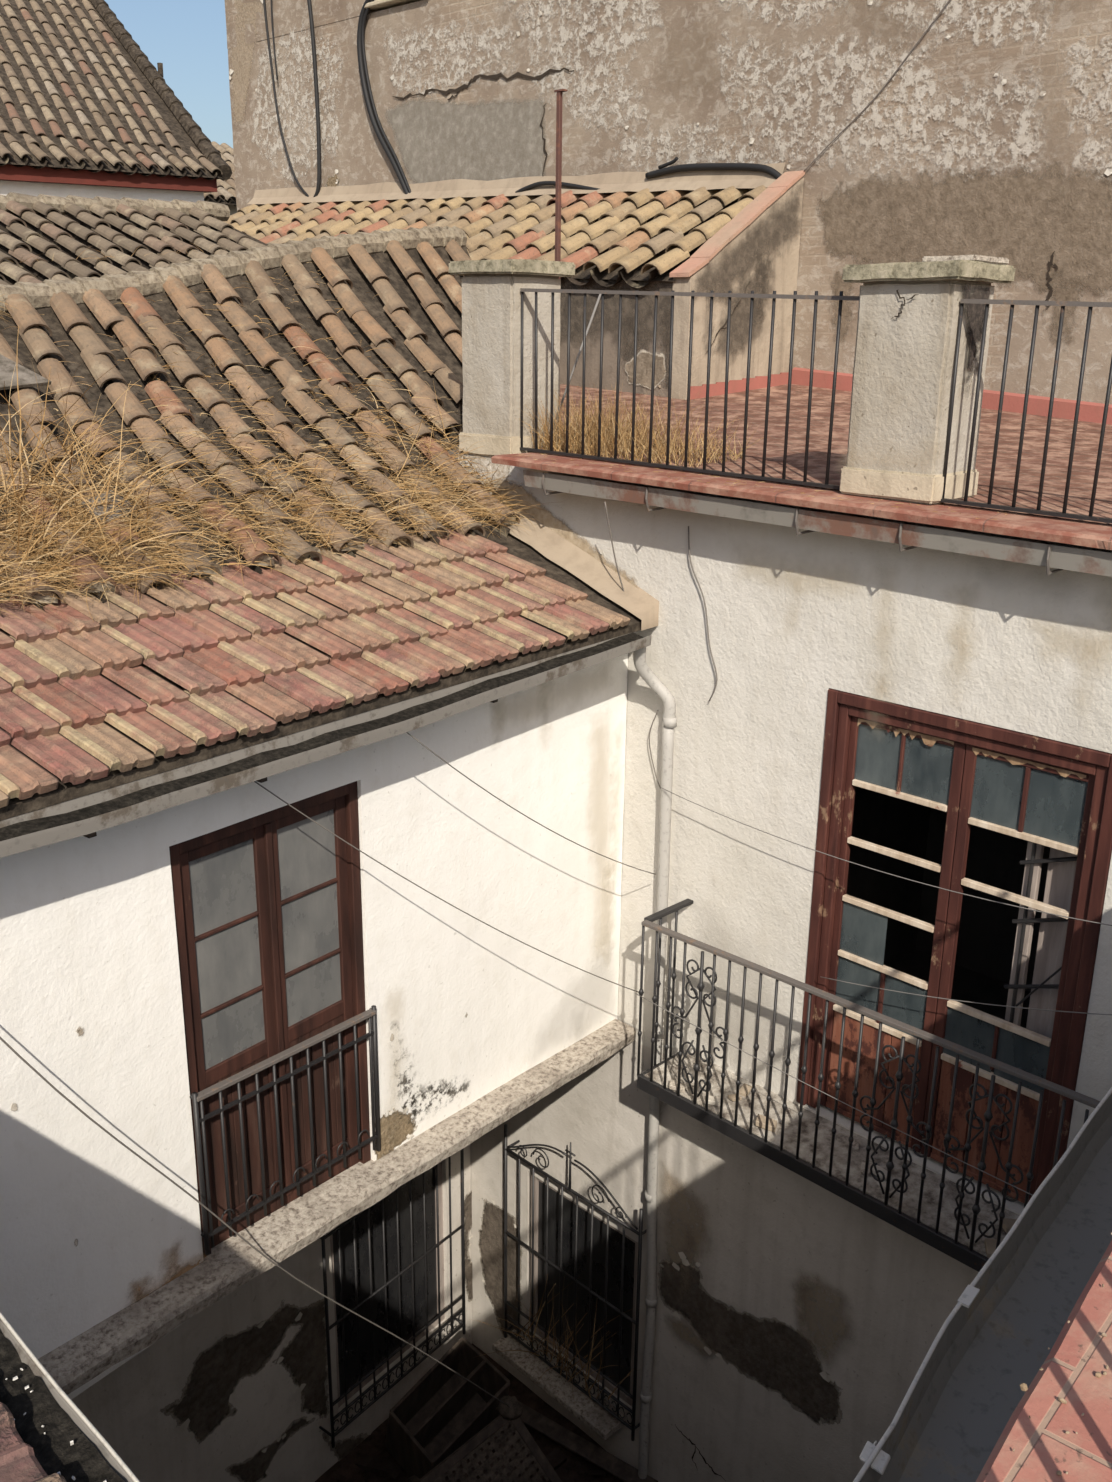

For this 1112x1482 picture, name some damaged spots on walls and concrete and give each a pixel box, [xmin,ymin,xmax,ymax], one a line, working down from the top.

crack [392,68,574,176]
flaking render [374,1107,418,1160]
flaking render [161,1299,373,1482]
flaking render [657,1252,843,1426]